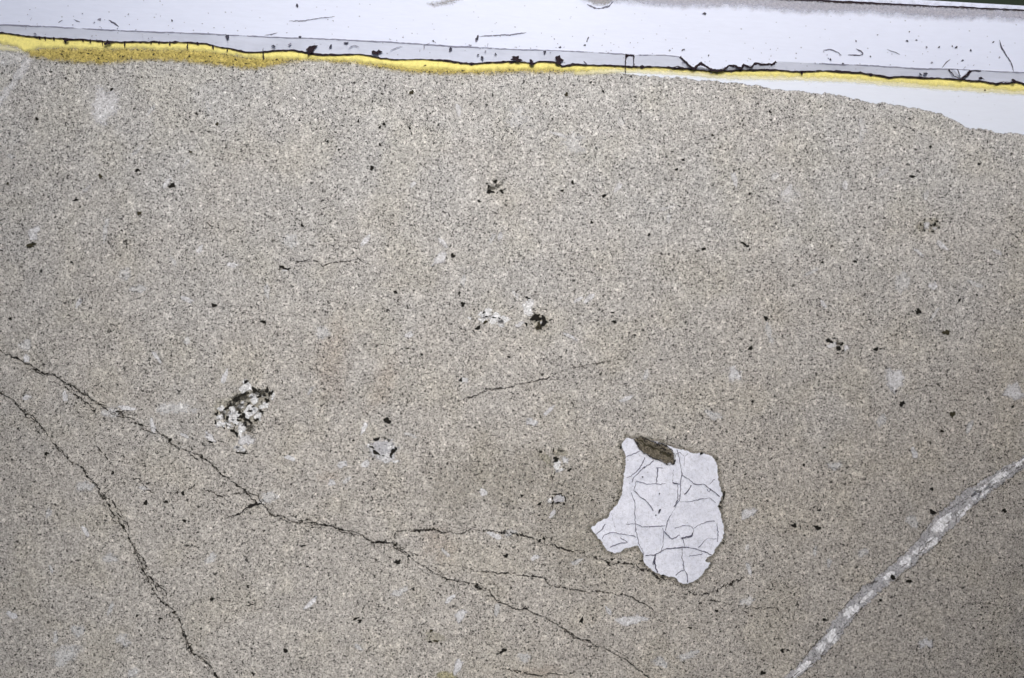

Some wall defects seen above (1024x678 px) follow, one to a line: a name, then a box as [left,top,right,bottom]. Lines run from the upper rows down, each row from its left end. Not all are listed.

peeling [615,71,1024,135]
spalling [205,379,275,454]
crack [0,349,779,678]
spalling [591,436,725,584]
crack [785,455,1024,678]